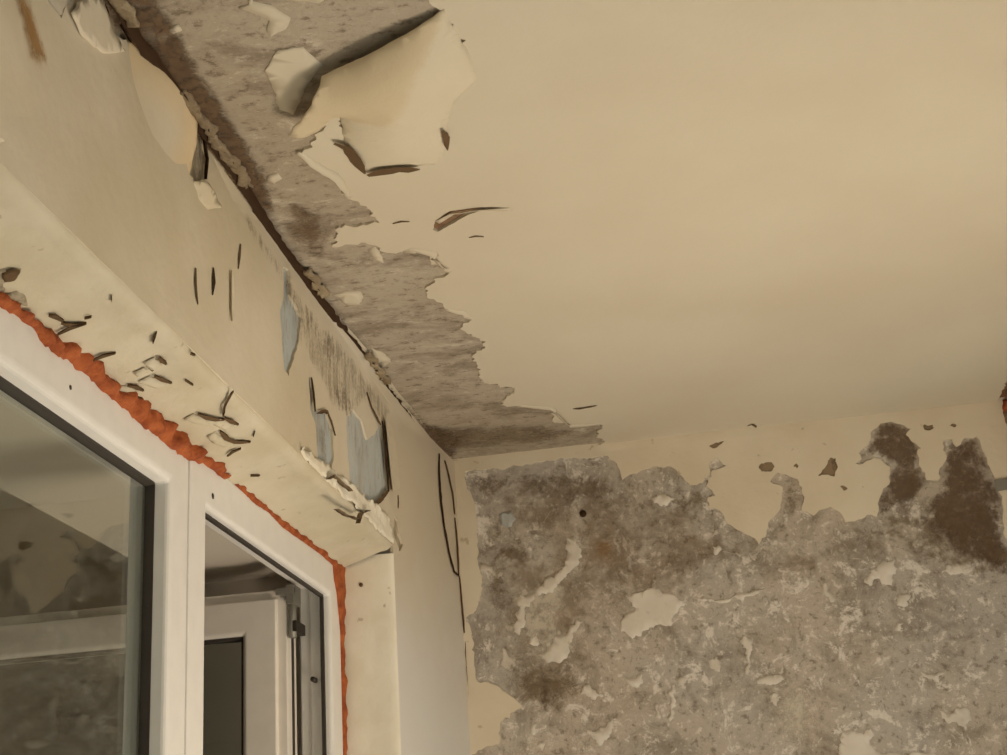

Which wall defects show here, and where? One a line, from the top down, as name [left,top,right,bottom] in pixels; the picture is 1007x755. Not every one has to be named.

peeling [0,268,28,306]
peeling [48,0,605,459]
peeling [465,422,1007,755]
damp [869,424,1007,573]